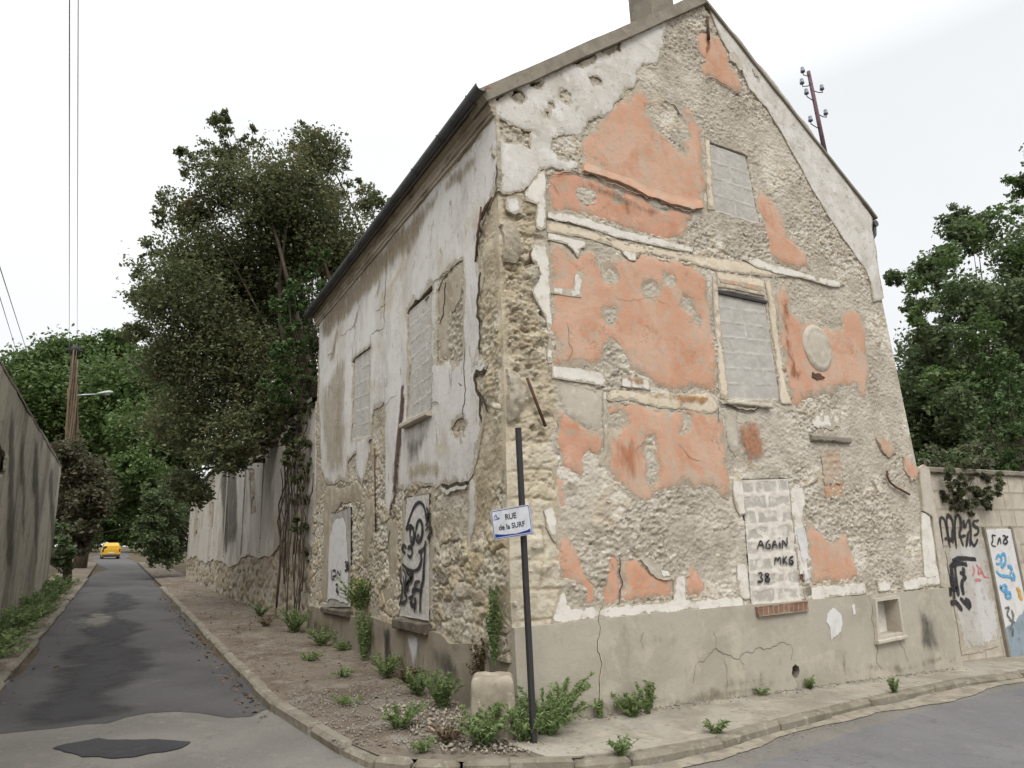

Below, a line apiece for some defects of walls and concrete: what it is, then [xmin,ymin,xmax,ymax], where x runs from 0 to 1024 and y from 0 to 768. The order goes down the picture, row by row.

crack [430,166,497,422]
spalling [632,6,932,595]
leakage [7,419,55,570]
leakage [221,471,237,550]
spalling [186,404,407,629]
corrosion [392,385,404,502]
spalling [430,188,751,635]
crack [597,556,624,707]
crack [693,634,799,690]